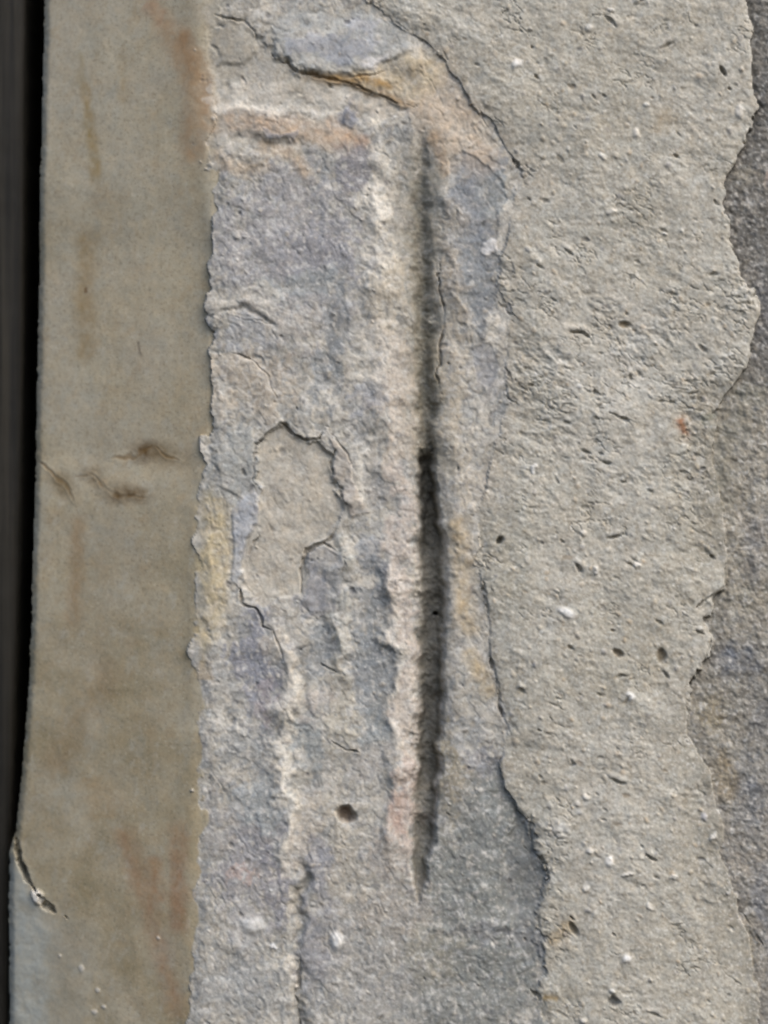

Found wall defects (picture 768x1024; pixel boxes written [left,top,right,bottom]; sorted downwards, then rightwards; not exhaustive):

corrosion [139,0,372,183]
spalling [203,4,416,142]
crack [214,13,419,108]
crack [511,157,521,169]
crack [433,258,447,410]
peeling [444,149,511,390]
spalling [207,421,371,622]
peeling [30,886,46,907]
spalling [333,804,359,826]
spalling [502,800,552,970]